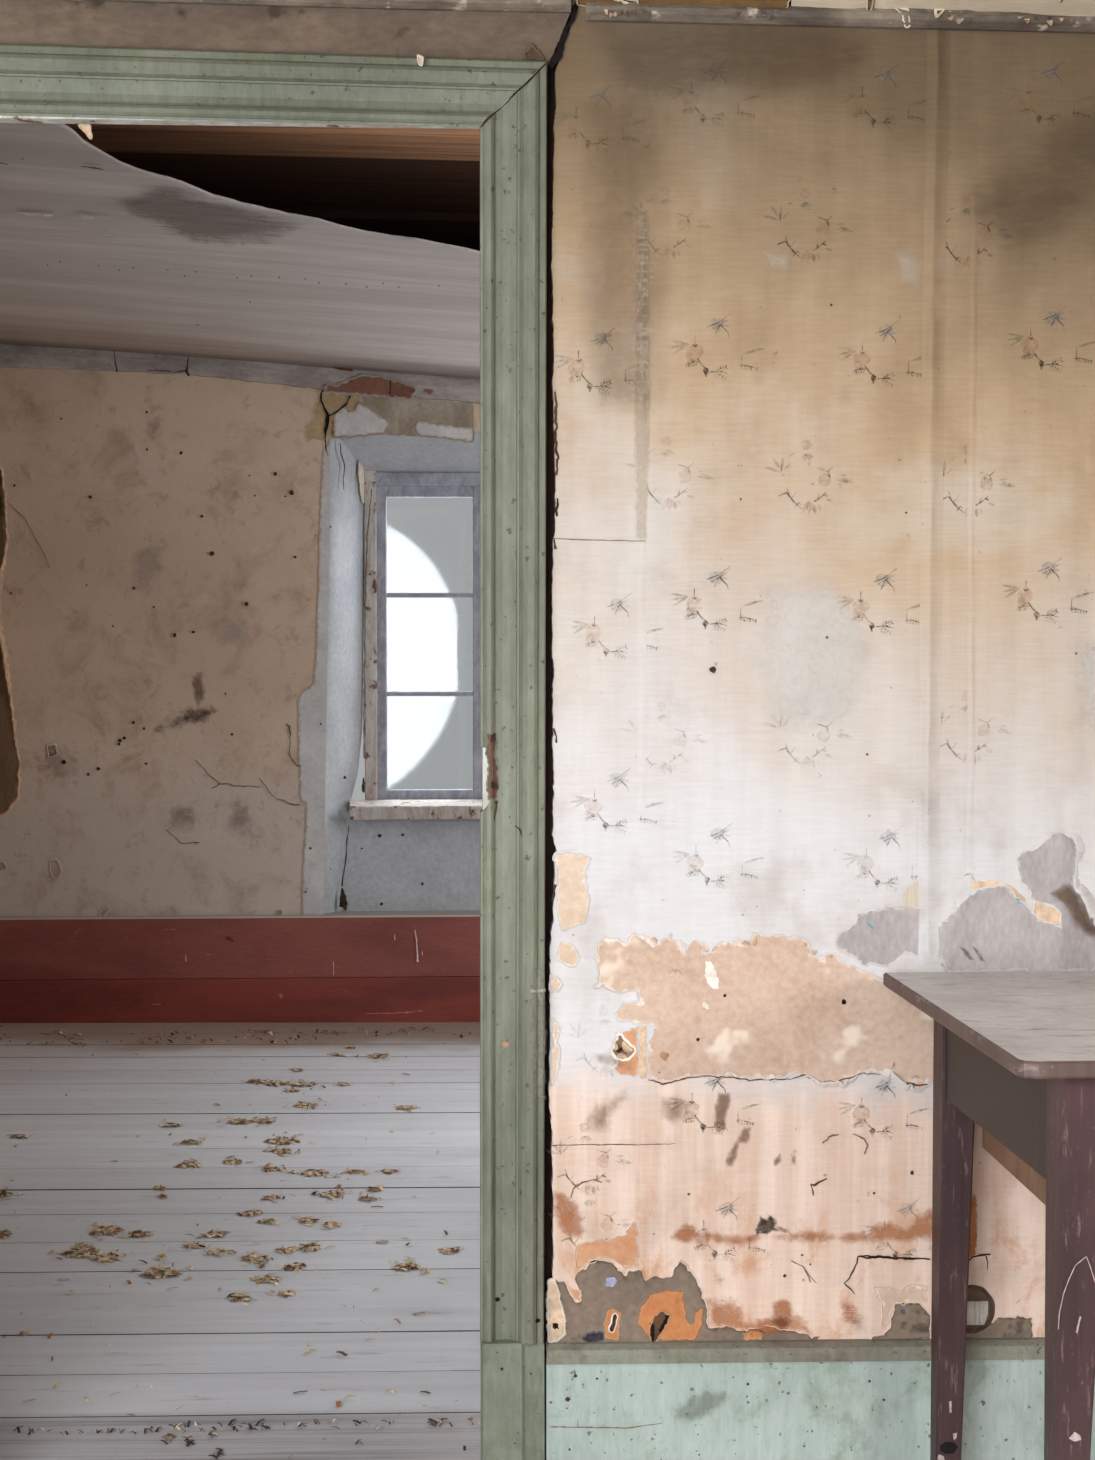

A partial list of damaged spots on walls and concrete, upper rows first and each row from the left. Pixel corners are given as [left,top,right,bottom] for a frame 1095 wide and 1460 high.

peeling [304,374,433,442]
spalling [609,1033,637,1061]
spalling [545,1259,820,1343]
spalling [870,1301,931,1340]
spalling [966,1315,1034,1338]